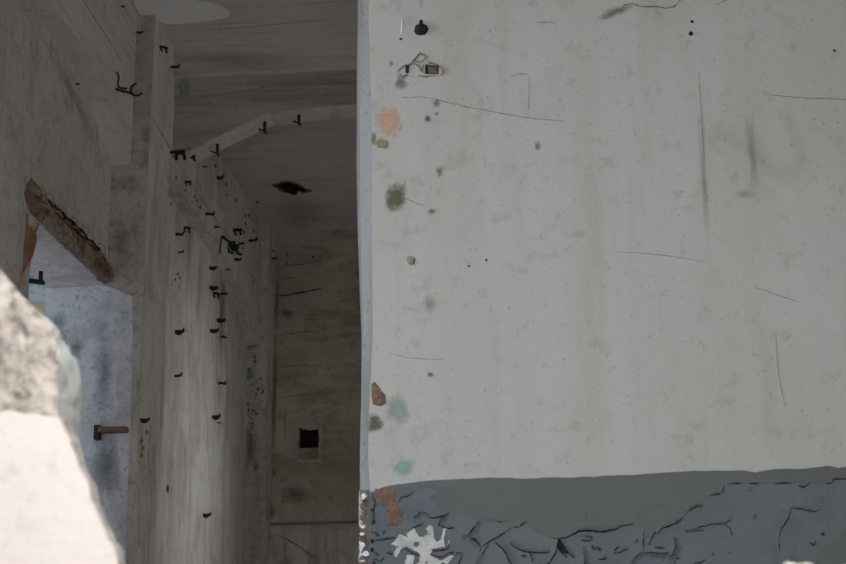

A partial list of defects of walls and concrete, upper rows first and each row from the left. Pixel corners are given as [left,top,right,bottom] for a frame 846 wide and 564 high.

damp [387,187,434,213]
spalling [22,213,39,275]
spalling [0,270,60,417]
corrosion [375,486,403,527]
peeling [358,488,732,564]